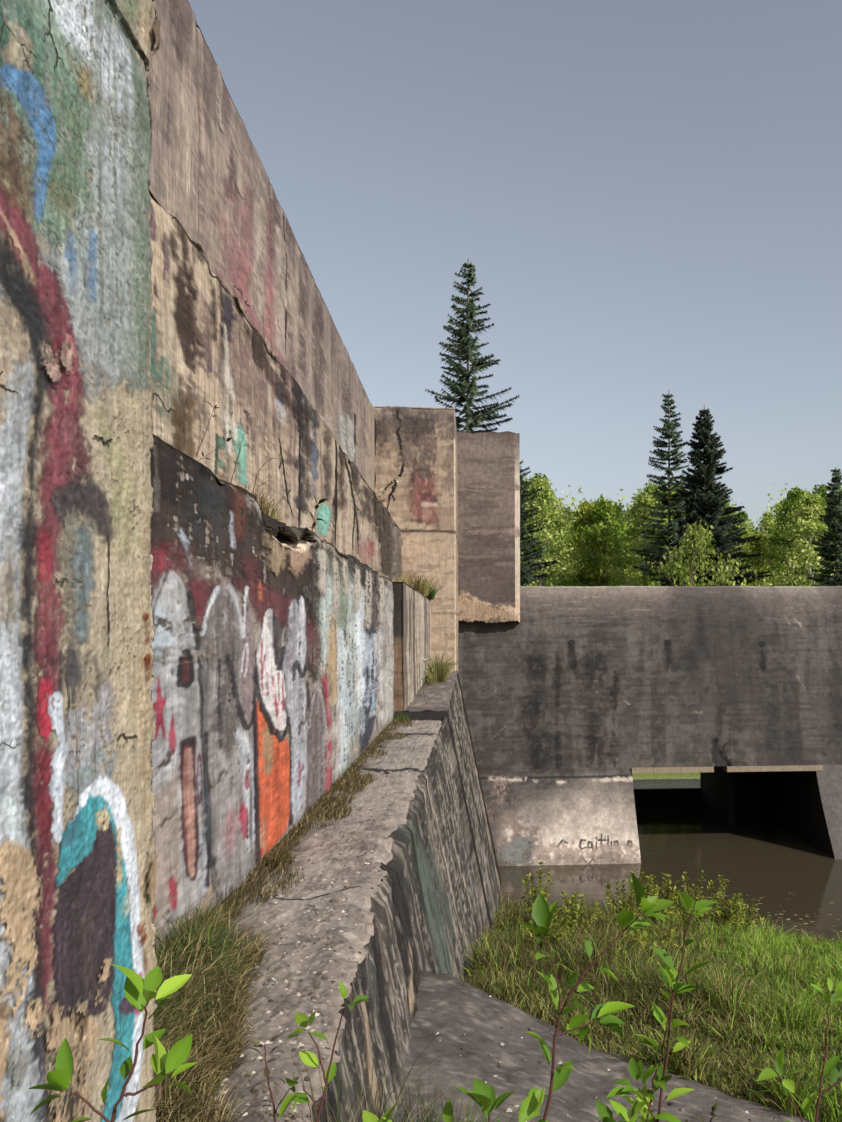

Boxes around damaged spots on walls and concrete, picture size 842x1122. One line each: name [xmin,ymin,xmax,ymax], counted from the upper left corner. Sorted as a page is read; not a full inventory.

crack [0,0,65,75]
crack [279,408,405,568]
spalling [255,496,312,576]
spalling [458,590,520,623]
peeling [0,838,112,1122]